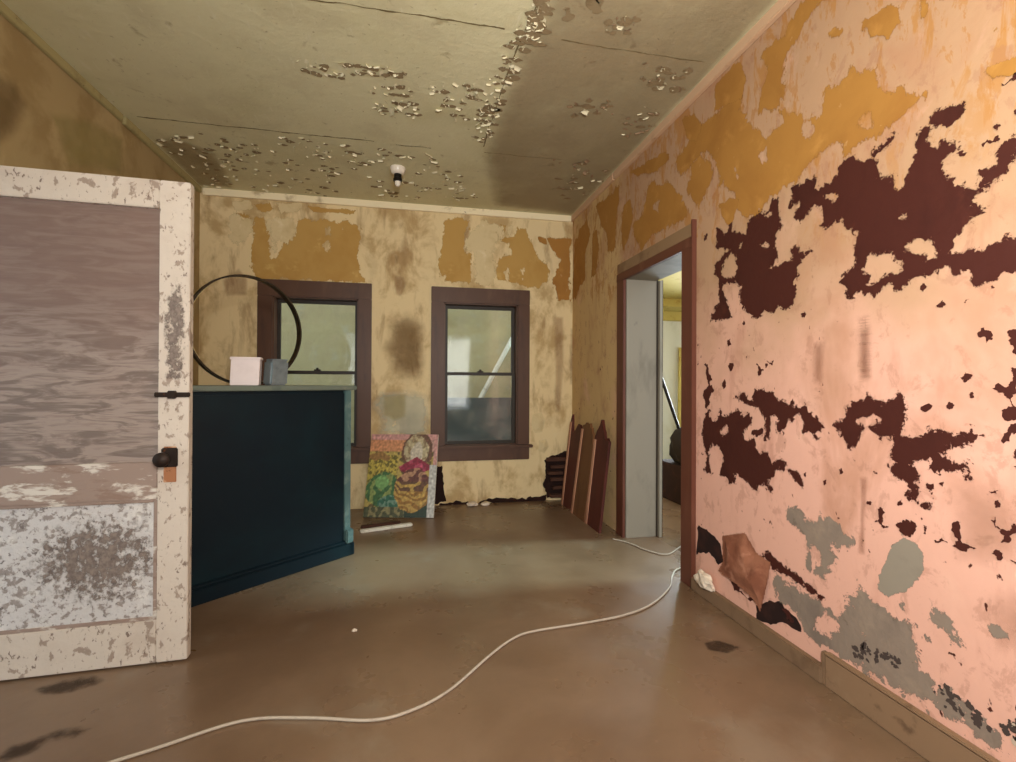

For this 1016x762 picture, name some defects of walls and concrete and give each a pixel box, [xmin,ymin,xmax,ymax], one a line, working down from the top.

peeling [429,0,1016,325]
peeling [156,132,478,283]
water stain [392,323,419,370]
peeling [977,328,993,343]
peeling [1007,329,1016,354]
peeling [701,363,985,510]
peeling [993,367,1016,467]
spalling [435,466,446,504]
spalling [543,451,567,498]
spalling [696,526,723,565]
peeling [989,490,1016,564]
flaking render [731,501,1010,755]